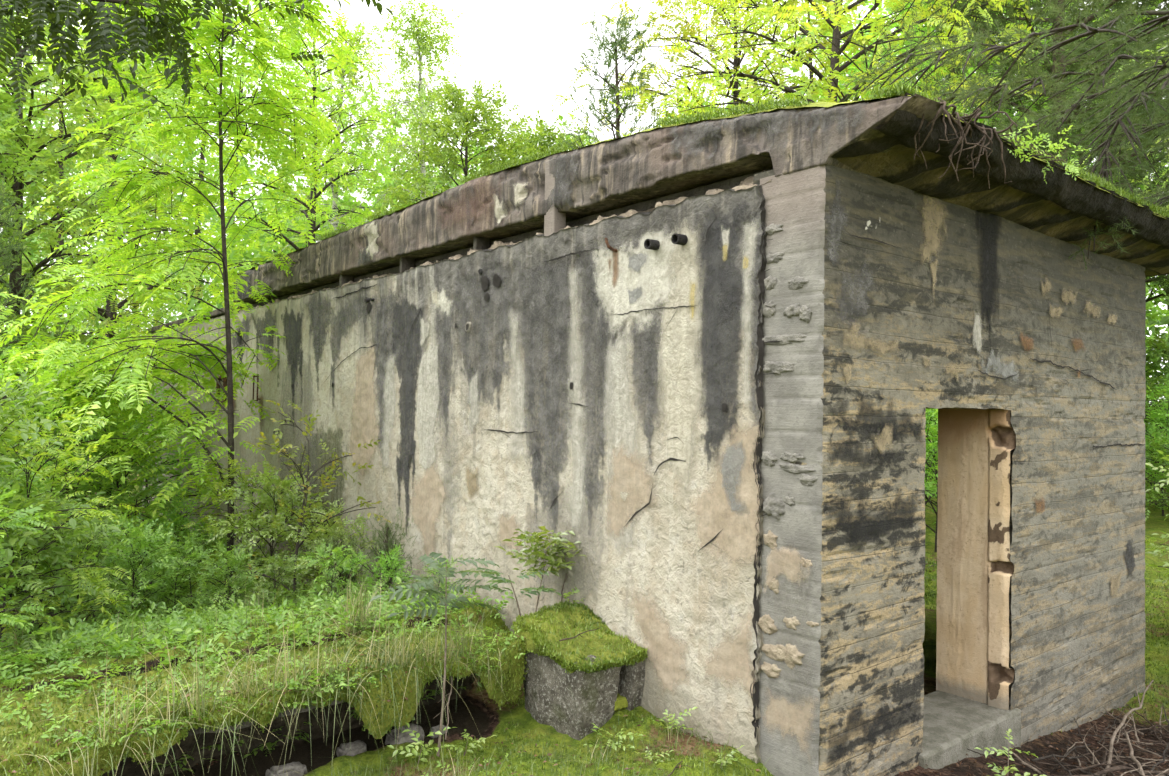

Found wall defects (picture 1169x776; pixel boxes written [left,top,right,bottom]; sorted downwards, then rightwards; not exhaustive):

water stain [974,211,1018,380]
water stain [232,204,764,591]
crack [488,429,538,438]
crack [624,437,686,527]
crack [750,200,780,739]